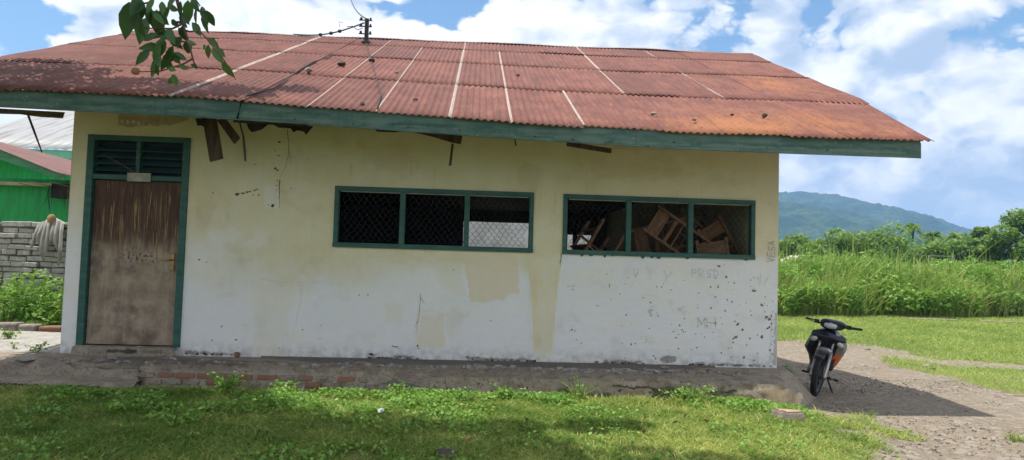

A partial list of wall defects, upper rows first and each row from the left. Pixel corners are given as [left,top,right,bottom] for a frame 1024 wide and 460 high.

peeling [93,248,777,393]